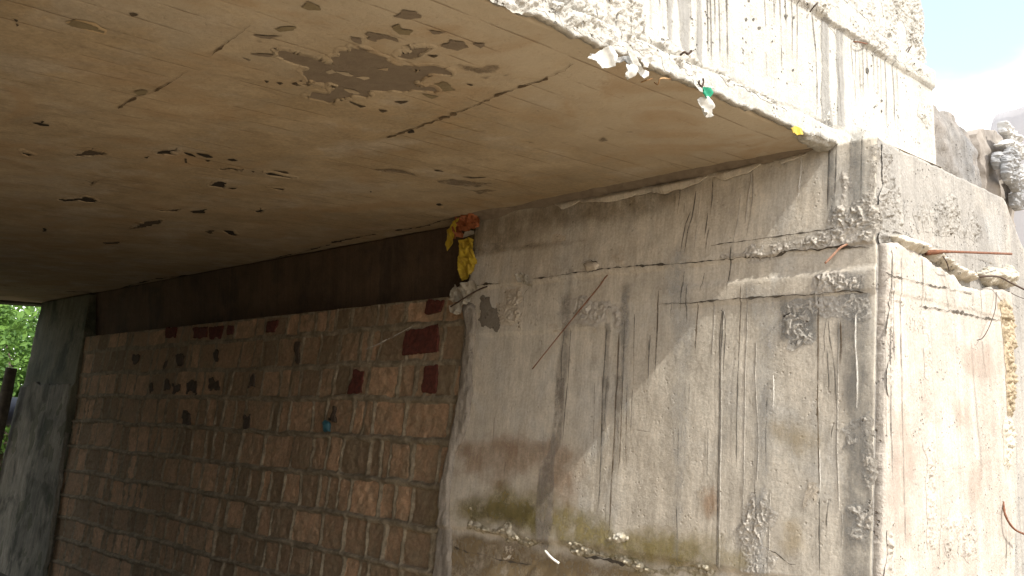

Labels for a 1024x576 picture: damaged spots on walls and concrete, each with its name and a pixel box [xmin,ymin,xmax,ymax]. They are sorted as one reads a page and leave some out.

peeling [244,10,498,108]
crack [387,64,573,138]
spalling [490,0,715,92]
spalling [144,147,300,189]
spalling [478,295,500,332]
crack [522,225,998,321]
leakage [536,330,571,547]
leakage [593,315,635,516]
spalling [998,298,1019,469]
spalling [466,506,539,549]
spalling [563,532,716,576]